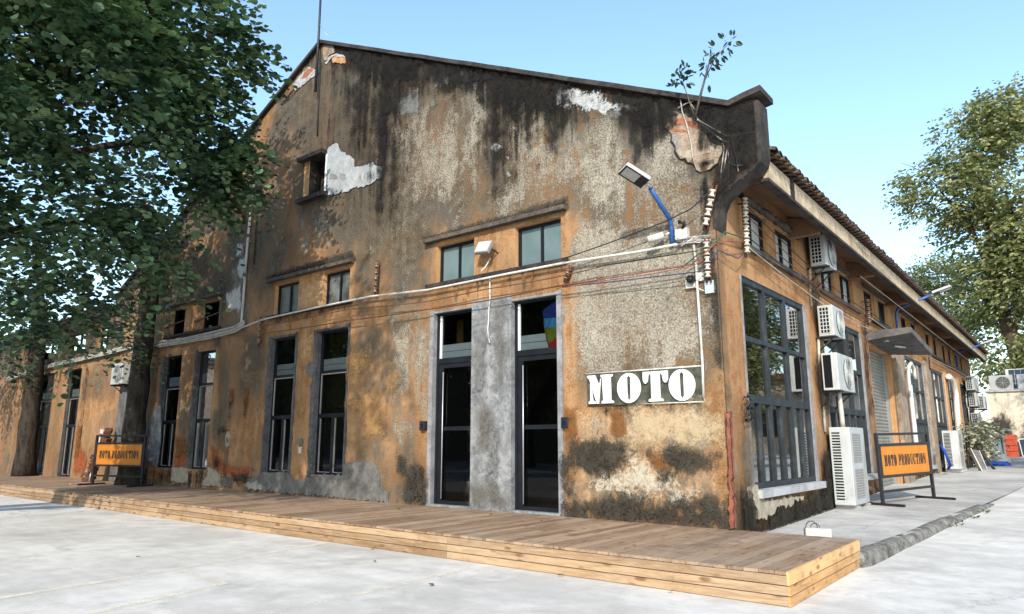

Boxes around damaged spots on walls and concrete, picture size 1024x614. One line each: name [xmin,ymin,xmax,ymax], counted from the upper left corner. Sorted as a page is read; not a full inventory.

peeling [284,44,346,103]
peeling [556,88,637,120]
spalling [326,142,381,196]
water stain [341,49,573,224]
spalling [665,108,723,173]
corrosion [210,447,249,484]
water stain [395,454,428,505]
water stain [558,420,730,530]
flaking render [722,411,804,529]